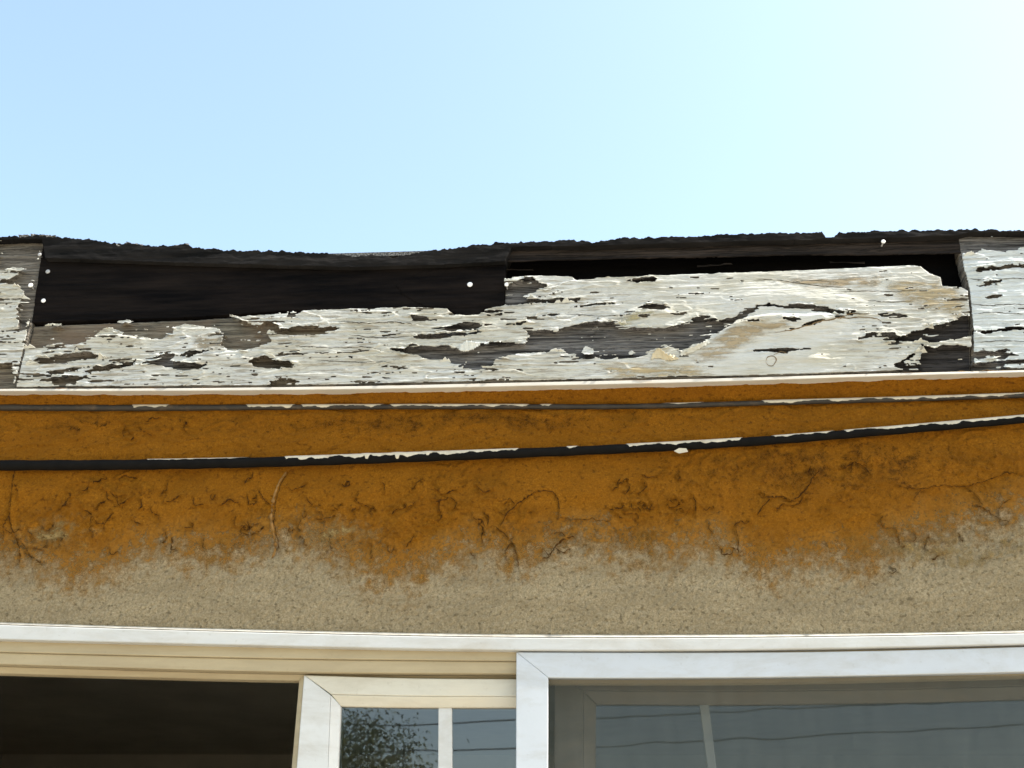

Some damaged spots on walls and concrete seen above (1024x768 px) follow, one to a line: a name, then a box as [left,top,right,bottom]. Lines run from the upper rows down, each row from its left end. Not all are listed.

peeling [959,237,1024,257]
peeling [976,263,1024,299]
peeling [0,243,339,389]
peeling [390,277,760,370]
peeling [857,315,1024,372]
crack [3,466,819,569]
crack [880,516,939,574]
crack [901,472,1022,522]